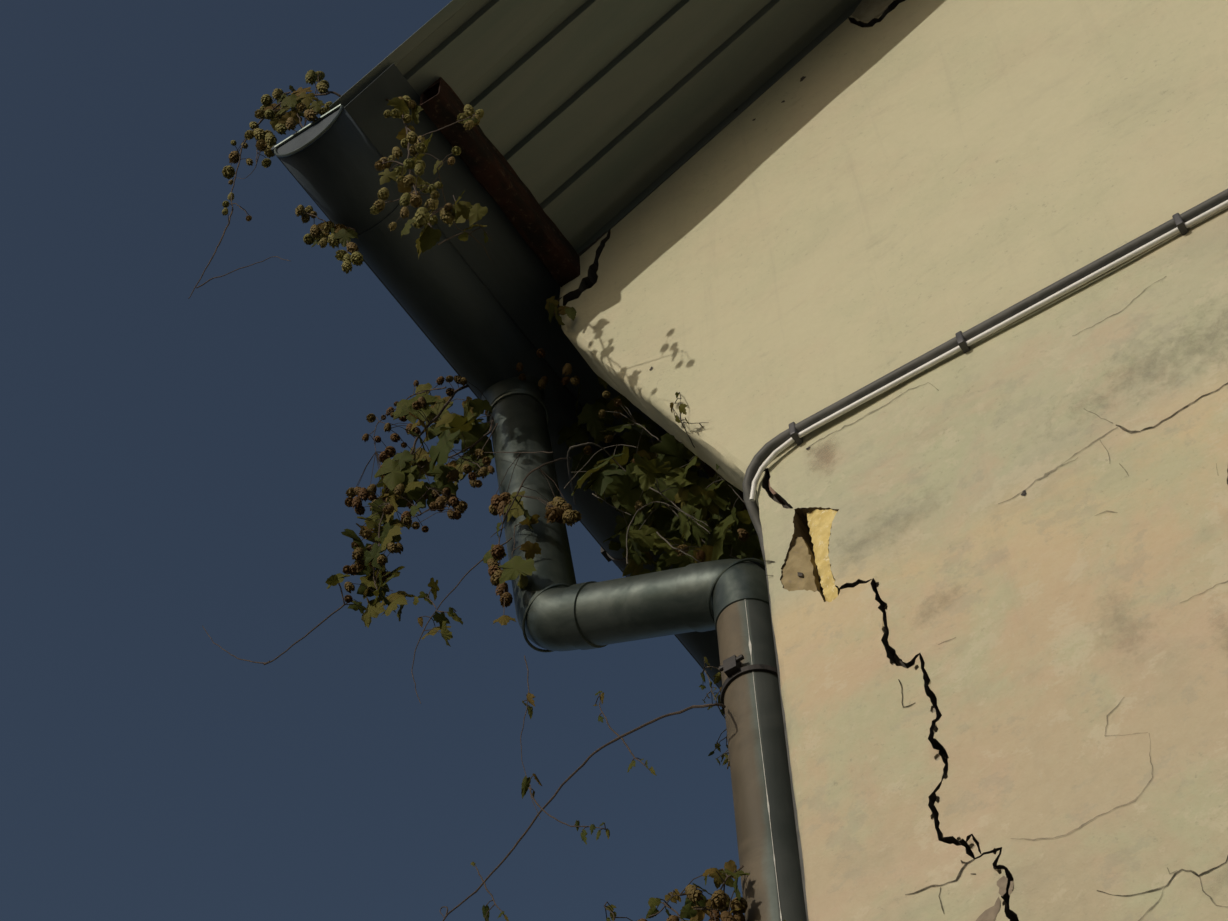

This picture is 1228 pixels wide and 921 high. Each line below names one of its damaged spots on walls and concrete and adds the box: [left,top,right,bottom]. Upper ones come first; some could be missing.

crack [848,0,905,27]
crack [554,229,611,316]
crack [1116,382,1228,434]
crack [762,468,793,509]
flaking render [780,507,843,602]
crack [841,578,1019,921]
crack [1097,856,1228,896]